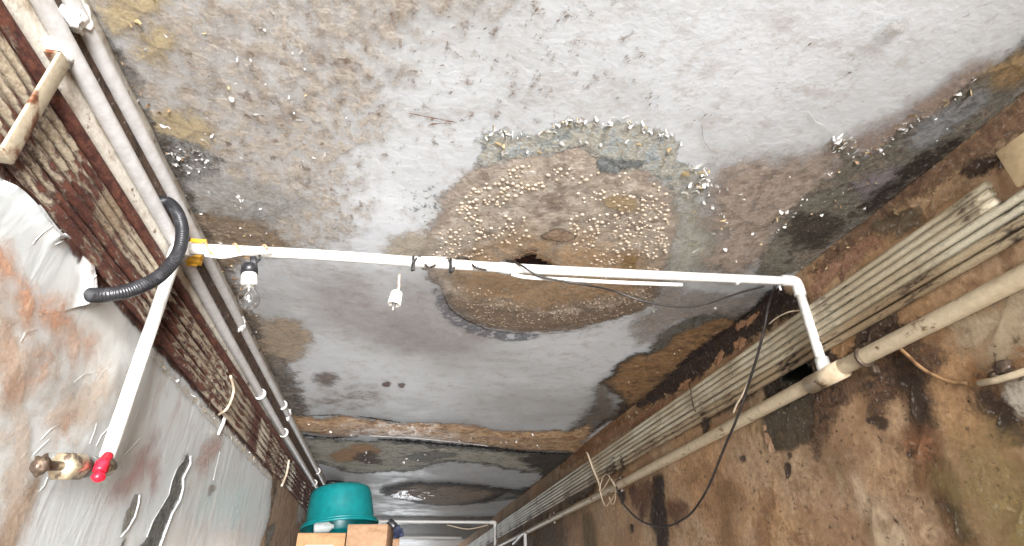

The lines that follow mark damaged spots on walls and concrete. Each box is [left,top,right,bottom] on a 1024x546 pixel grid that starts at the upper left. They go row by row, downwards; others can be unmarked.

rust [0,163,39,205]
rust [50,221,109,288]
leakage [89,0,474,417]
peeling [472,115,710,196]
leakage [385,40,1024,409]
rust [0,248,94,359]
rust [114,300,144,333]
rust [153,340,279,476]
peeling [303,424,544,474]
leakage [379,453,571,506]
leakage [618,341,1024,546]